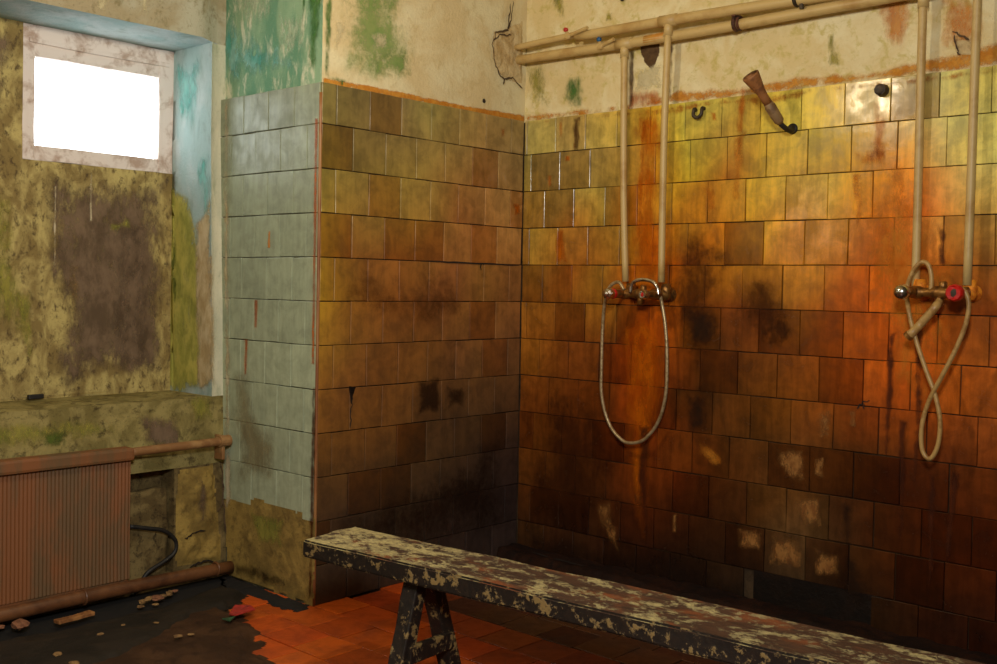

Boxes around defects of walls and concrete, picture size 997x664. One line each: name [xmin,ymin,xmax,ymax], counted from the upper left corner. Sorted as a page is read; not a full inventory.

spalling [493,21,523,83]
water stain [50,182,160,382]
water stain [781,452,802,476]
water stain [742,531,759,549]
water stain [774,541,800,565]
water stain [815,555,836,574]